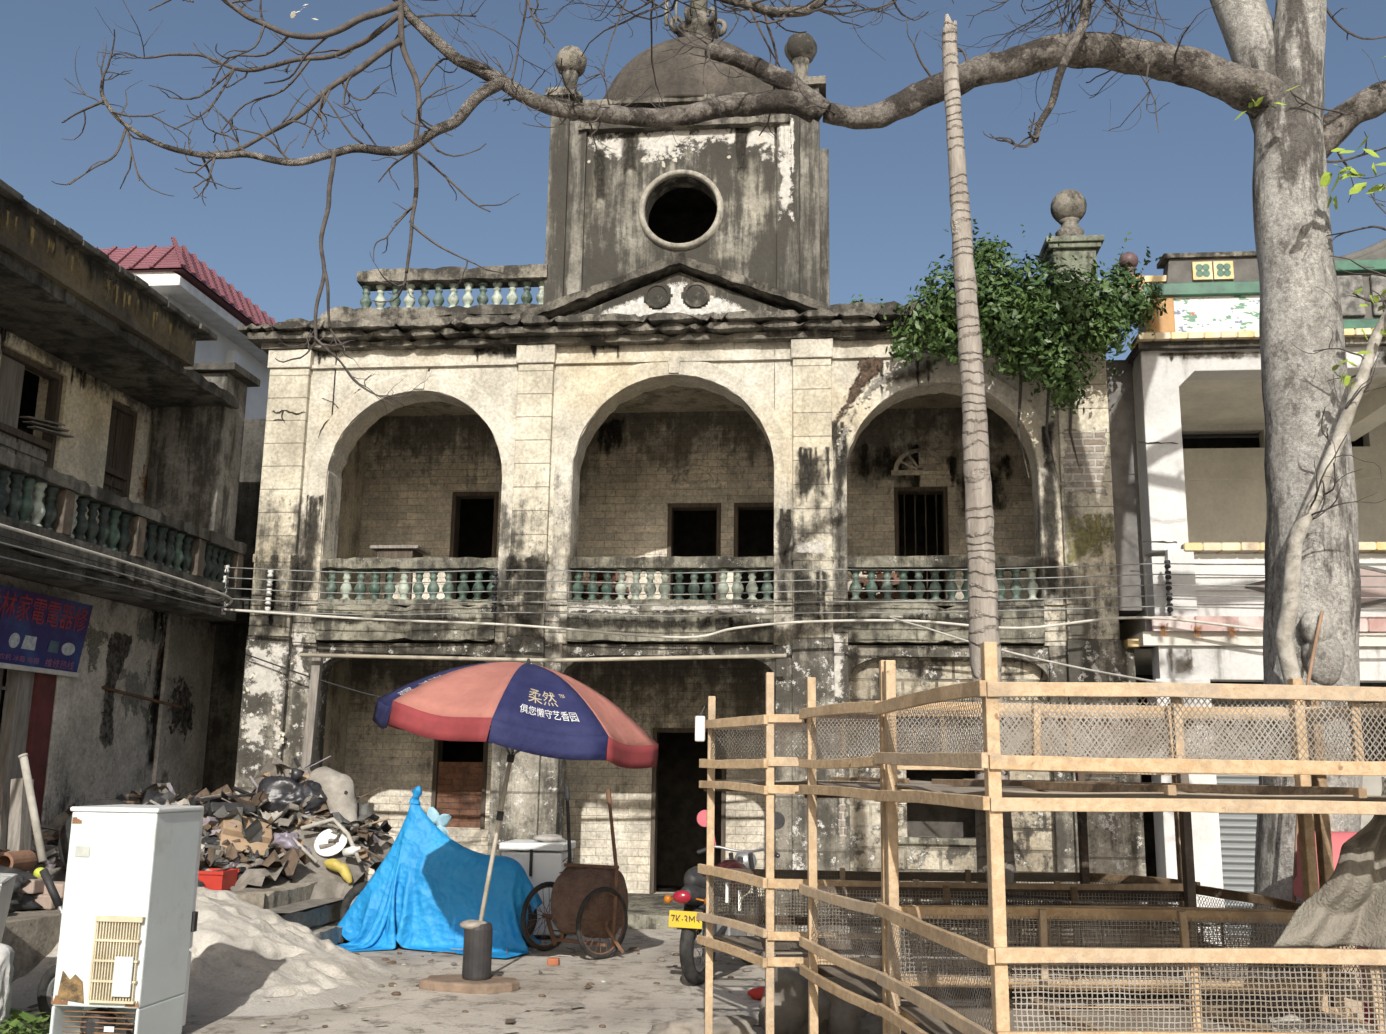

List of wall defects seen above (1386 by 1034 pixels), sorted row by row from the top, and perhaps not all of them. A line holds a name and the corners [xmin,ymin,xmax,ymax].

peeling [587,114,795,221]
water stain [597,419,624,455]
water stain [796,421,920,507]
water stain [948,457,965,511]
water stain [990,456,1012,510]
water stain [506,551,545,647]
water stain [558,508,842,643]
water stain [842,613,969,630]
water stain [1084,514,1114,553]
water stain [146,612,164,769]